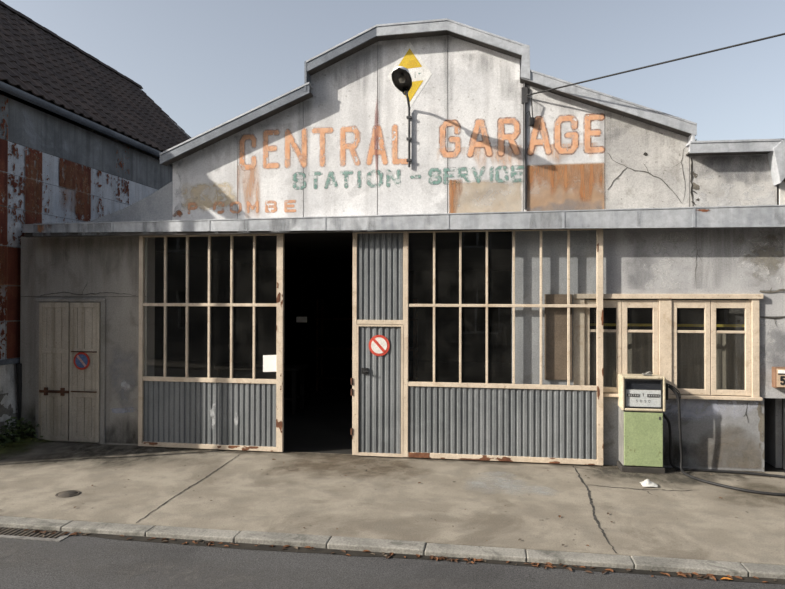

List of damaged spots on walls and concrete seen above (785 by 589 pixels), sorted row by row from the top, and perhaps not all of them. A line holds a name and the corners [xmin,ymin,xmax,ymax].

corrosion [527,144,604,211]
crack [608,148,697,206]
leakage [745,235,784,270]